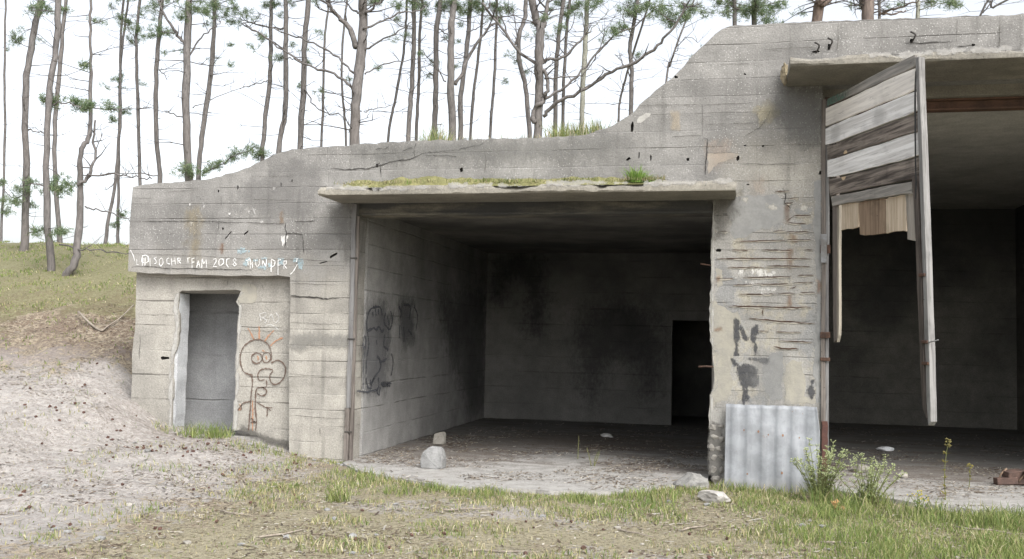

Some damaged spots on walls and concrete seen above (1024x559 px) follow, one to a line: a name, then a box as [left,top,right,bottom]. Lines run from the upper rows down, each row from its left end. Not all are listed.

crack [331,143,486,173]
flaking render [707,180,821,483]